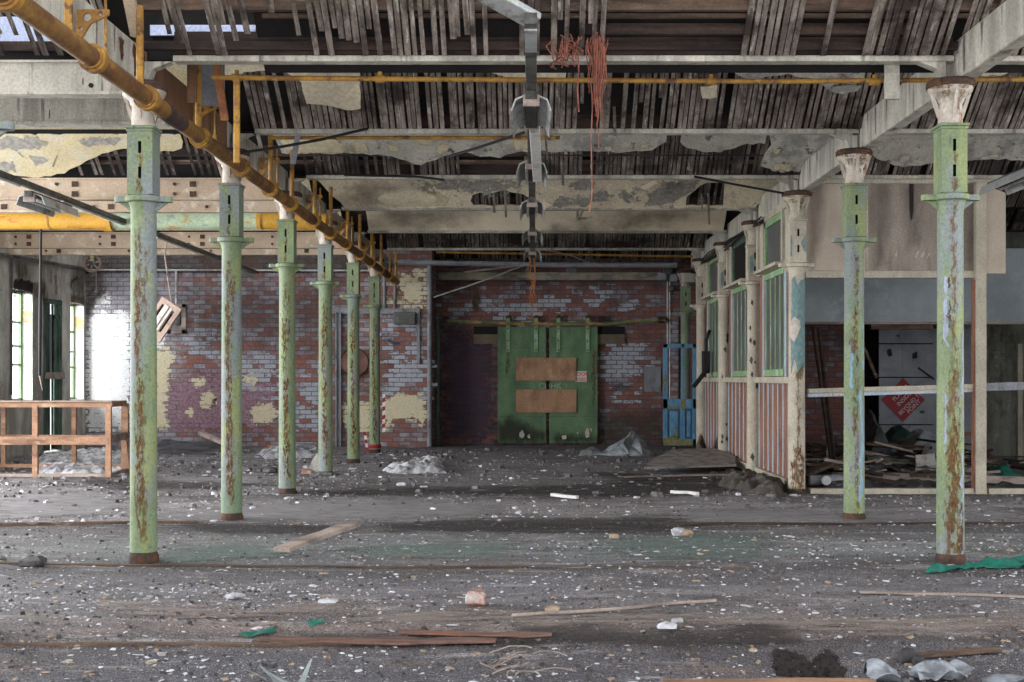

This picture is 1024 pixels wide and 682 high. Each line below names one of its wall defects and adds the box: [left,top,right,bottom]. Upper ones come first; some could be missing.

flaking render [0,134,127,178]
flaking render [288,73,361,110]
flaking render [273,135,528,165]
flaking render [318,135,835,209]
peeling [86,289,130,432]
rust [133,235,149,541]
peeling [157,334,221,439]
rust [224,261,235,500]
rust [281,283,291,479]
rust [320,299,329,465]
rust [849,254,860,515]
rust [944,206,964,557]